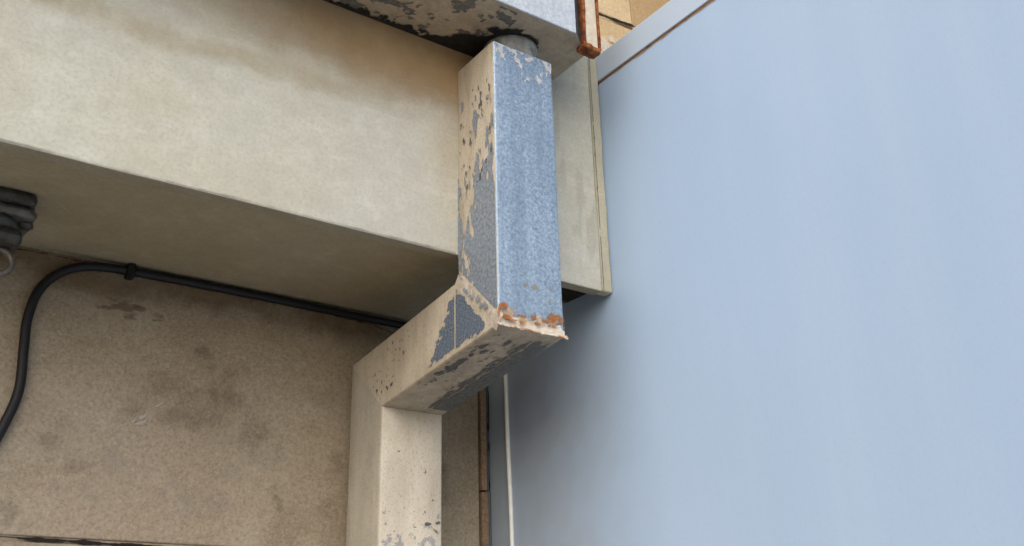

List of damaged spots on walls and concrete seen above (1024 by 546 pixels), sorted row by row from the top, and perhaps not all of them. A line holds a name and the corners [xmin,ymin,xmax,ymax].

peeling [340,0,551,87]
peeling [425,79,565,411]
corrosion [497,302,563,328]